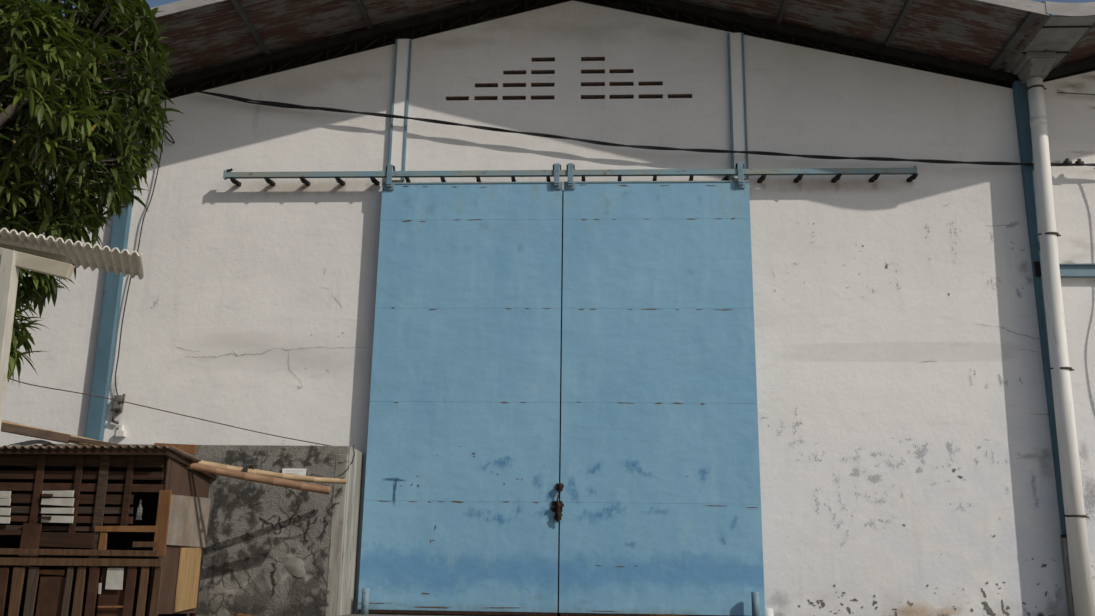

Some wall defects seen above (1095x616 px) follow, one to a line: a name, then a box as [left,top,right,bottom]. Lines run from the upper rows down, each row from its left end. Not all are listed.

peeling [887,438,965,486]
crack [259,445,355,543]
crack [270,560,278,597]
peeling [798,584,878,614]
peeling [971,582,1010,616]